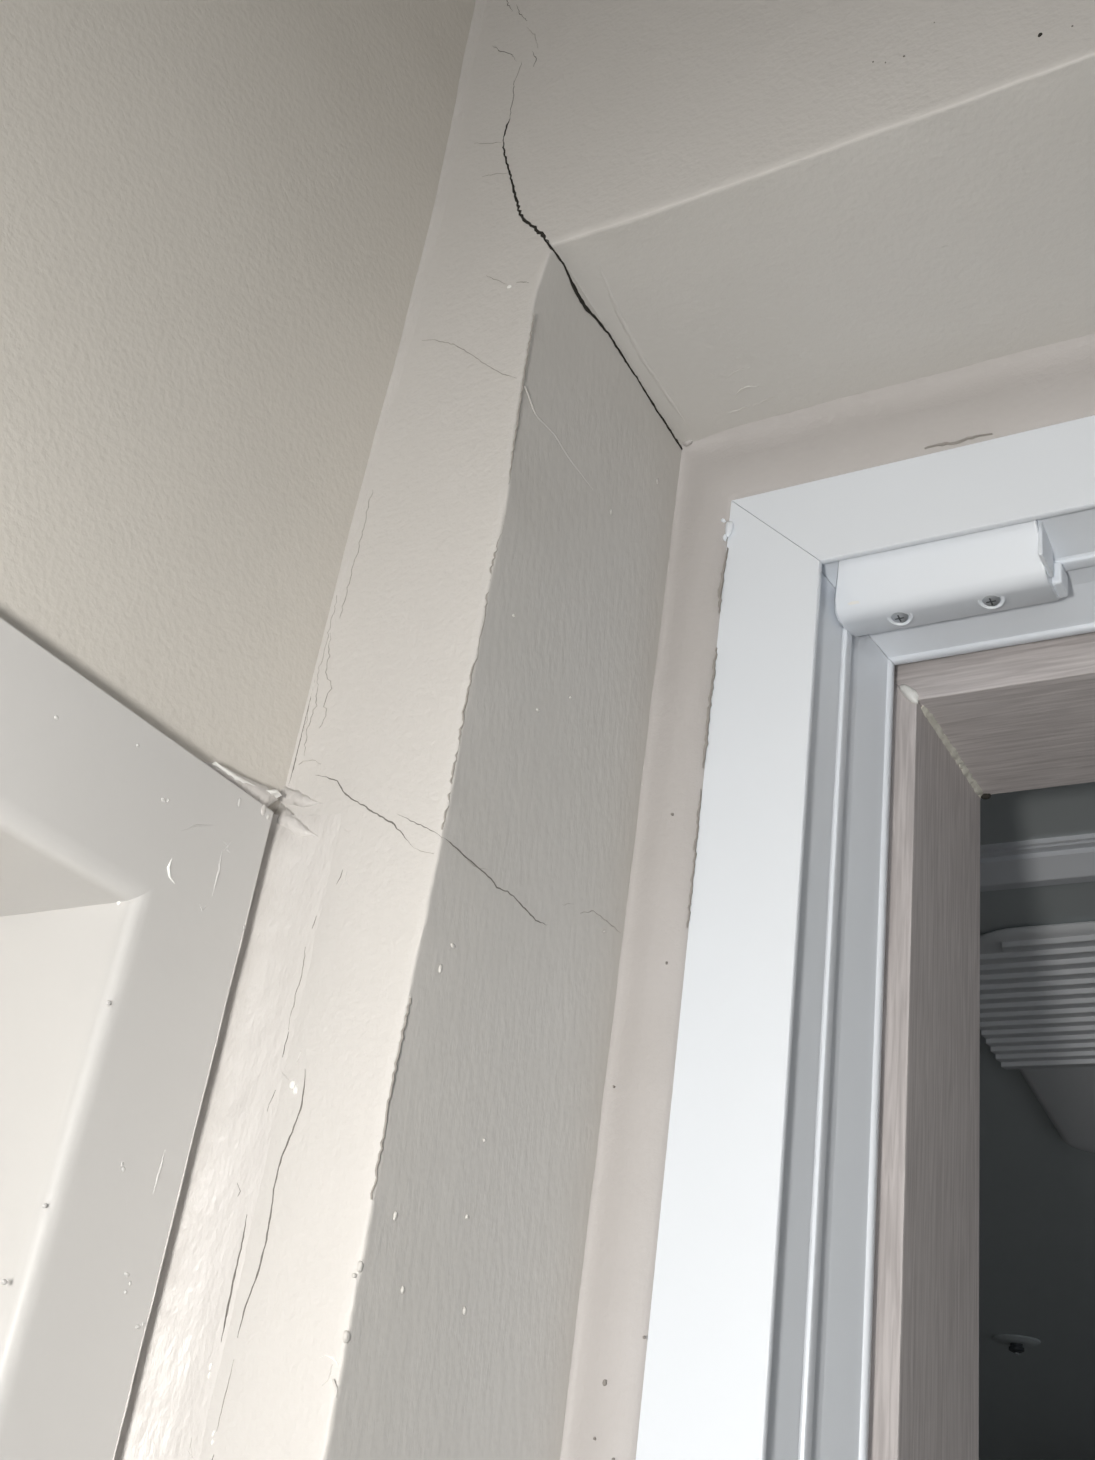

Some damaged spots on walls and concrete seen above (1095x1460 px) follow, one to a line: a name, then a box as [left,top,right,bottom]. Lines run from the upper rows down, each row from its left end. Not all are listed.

crack [479,1,693,450]
crack [289,493,619,932]
crack [212,947,306,1460]